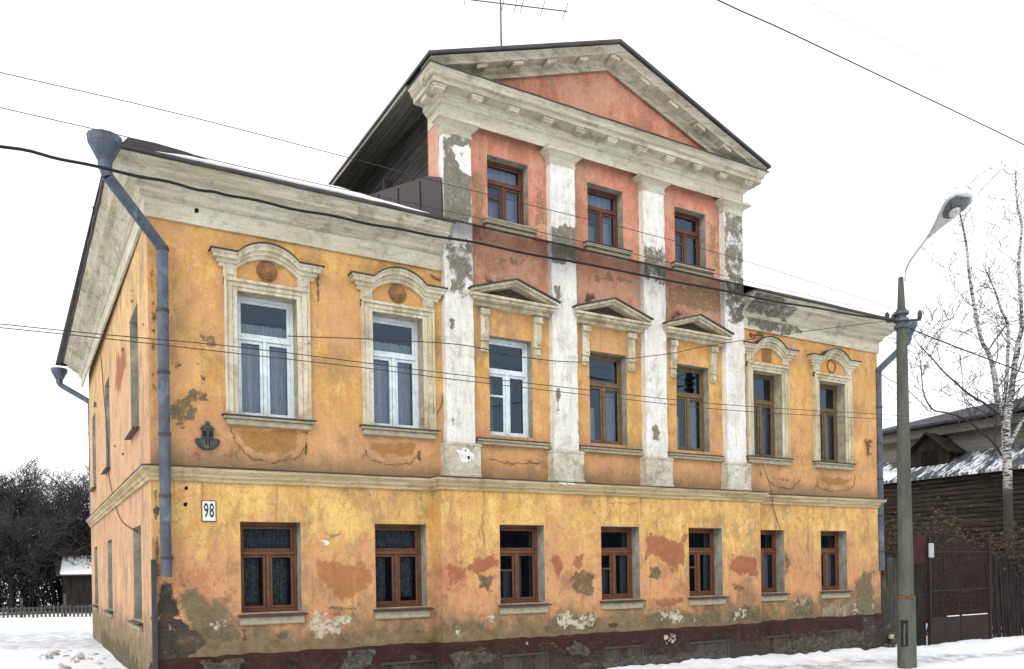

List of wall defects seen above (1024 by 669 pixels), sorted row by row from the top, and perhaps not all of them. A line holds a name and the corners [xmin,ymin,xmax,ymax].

peeling [443,134,484,298]
peeling [644,213,802,349]
flaking render [170,335,216,429]
crack [229,426,307,464]
crack [361,438,417,465]
crack [487,457,543,465]
peeling [448,555,499,590]
peeling [645,533,687,572]
spalling [149,615,245,669]
peeling [305,606,376,669]
spalling [557,597,728,669]